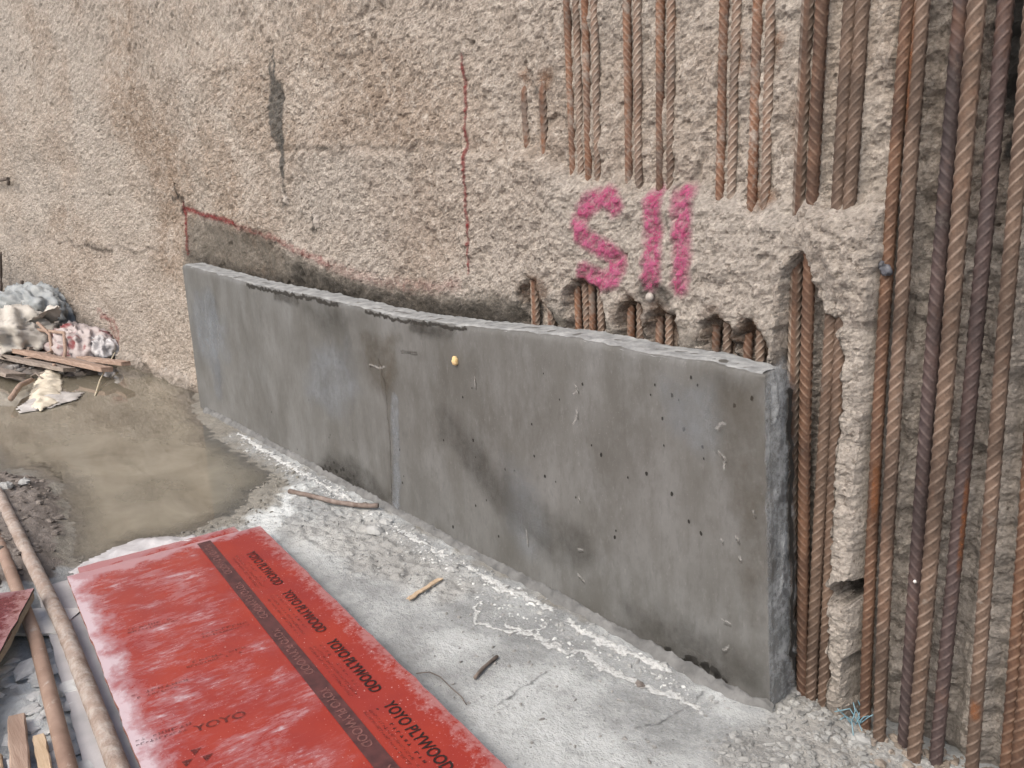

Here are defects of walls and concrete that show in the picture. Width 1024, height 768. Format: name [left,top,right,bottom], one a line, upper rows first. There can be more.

water stain [267,54,285,182]
spalling [518,278,680,346]
spalling [701,251,850,707]